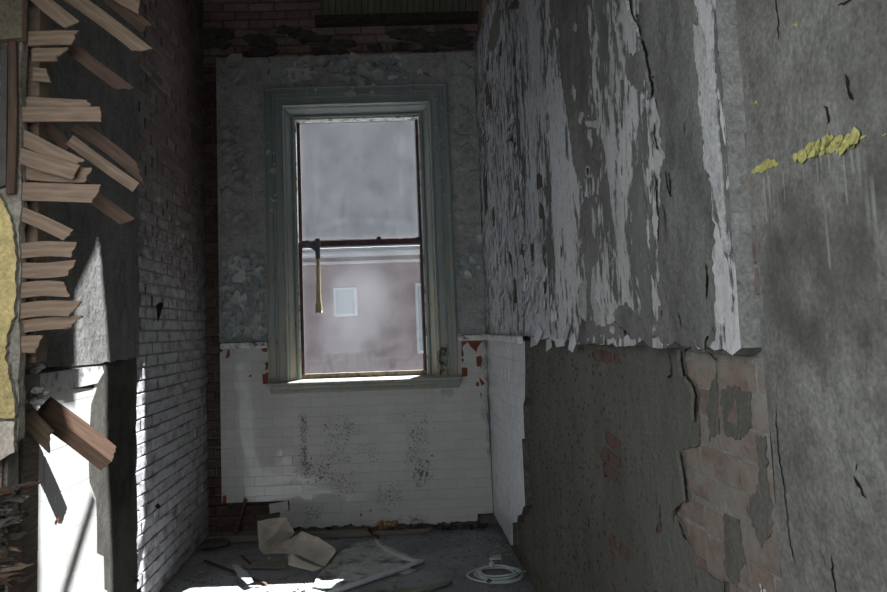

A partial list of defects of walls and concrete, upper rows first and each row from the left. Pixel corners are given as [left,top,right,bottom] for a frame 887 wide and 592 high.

peeling [793,127,867,163]
peeling [0,193,50,487]
peeling [201,0,781,592]